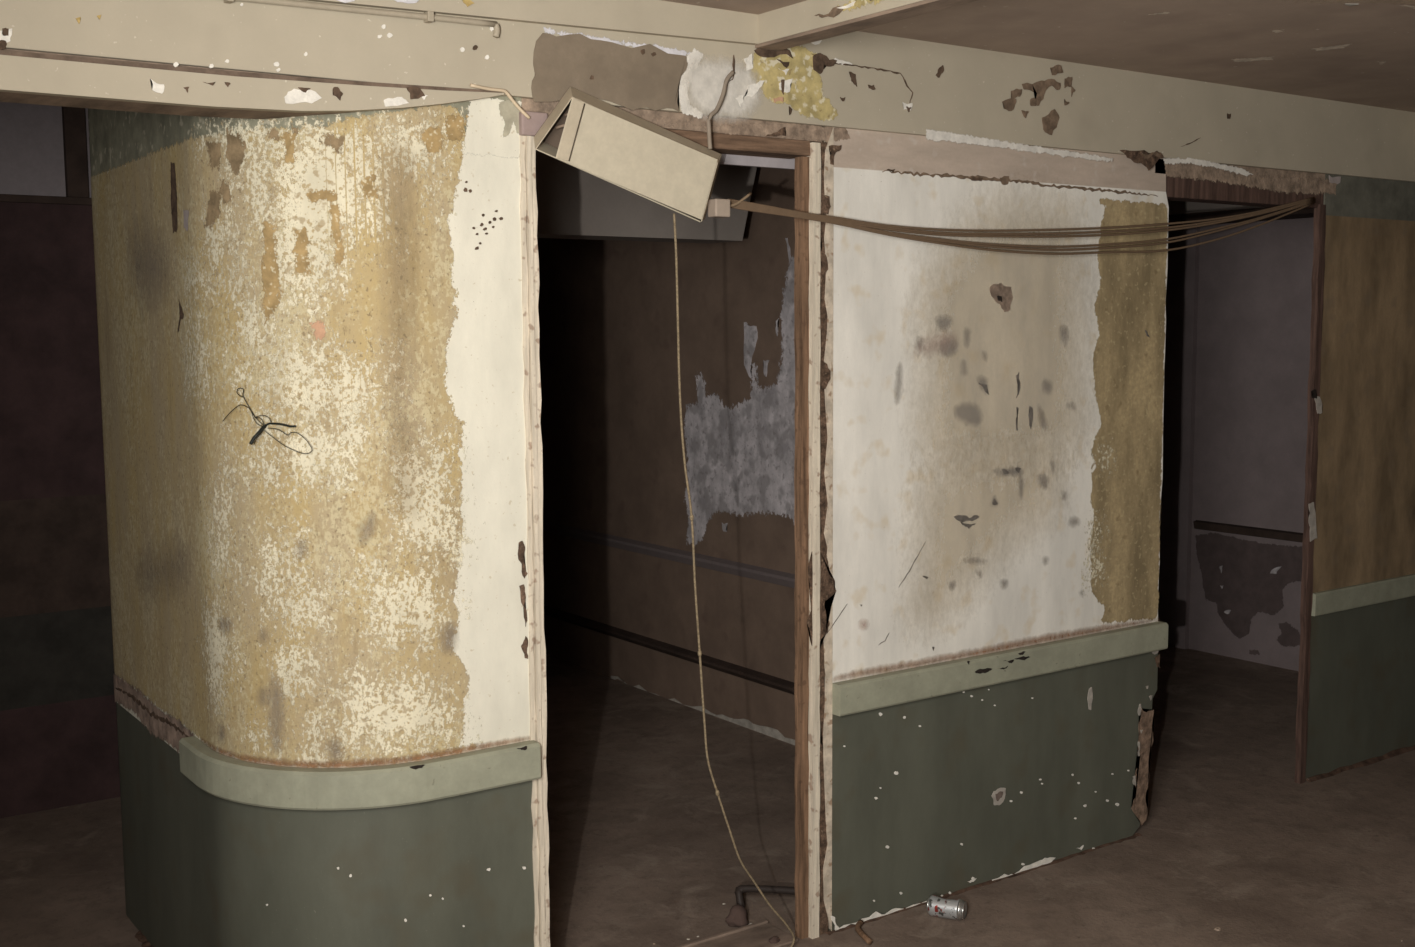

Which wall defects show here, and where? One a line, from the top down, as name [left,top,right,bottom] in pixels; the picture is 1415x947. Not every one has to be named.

peeling [0,28,12,50]
peeling [814,0,881,18]
peeling [1002,65,1075,135]
peeling [91,33,875,769]
peeling [1016,373,1033,431]
peeling [1081,198,1168,624]
peeling [954,515,979,528]
peeling [1195,502,1317,655]
flaking render [1071,686,1154,825]